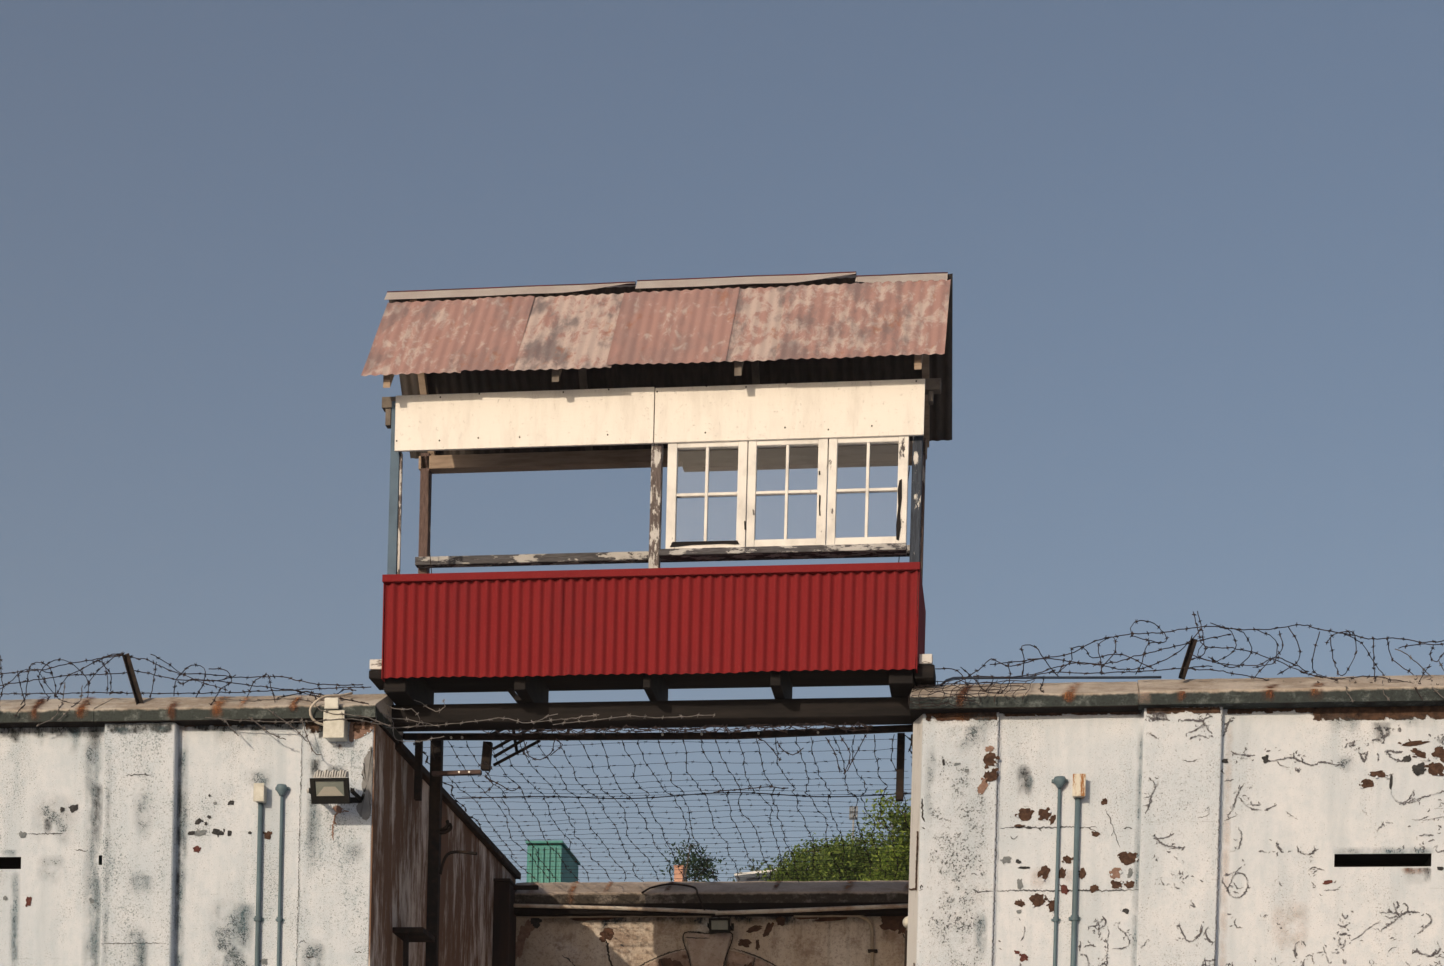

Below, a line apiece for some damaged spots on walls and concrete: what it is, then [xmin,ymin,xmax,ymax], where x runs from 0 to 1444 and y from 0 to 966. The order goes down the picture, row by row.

peeling [942,746,1000,795]
peeling [926,706,1444,776]
peeling [1359,770,1393,789]
damp [0,724,298,966]
peeling [188,794,272,853]
peeling [1014,807,1056,829]
peeling [1000,850,1139,914]
crack [1213,773,1221,966]
peeling [658,958,683,966]